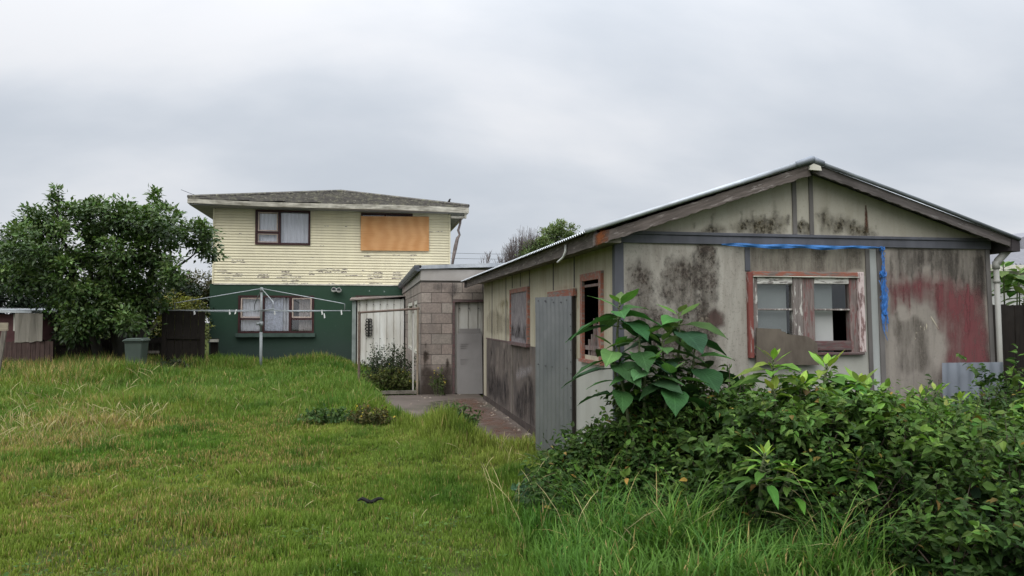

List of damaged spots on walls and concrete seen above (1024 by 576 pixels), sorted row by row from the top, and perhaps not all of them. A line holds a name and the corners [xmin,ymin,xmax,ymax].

water stain [739,218,782,234]
peeling [257,268,403,284]
water stain [629,226,723,374]